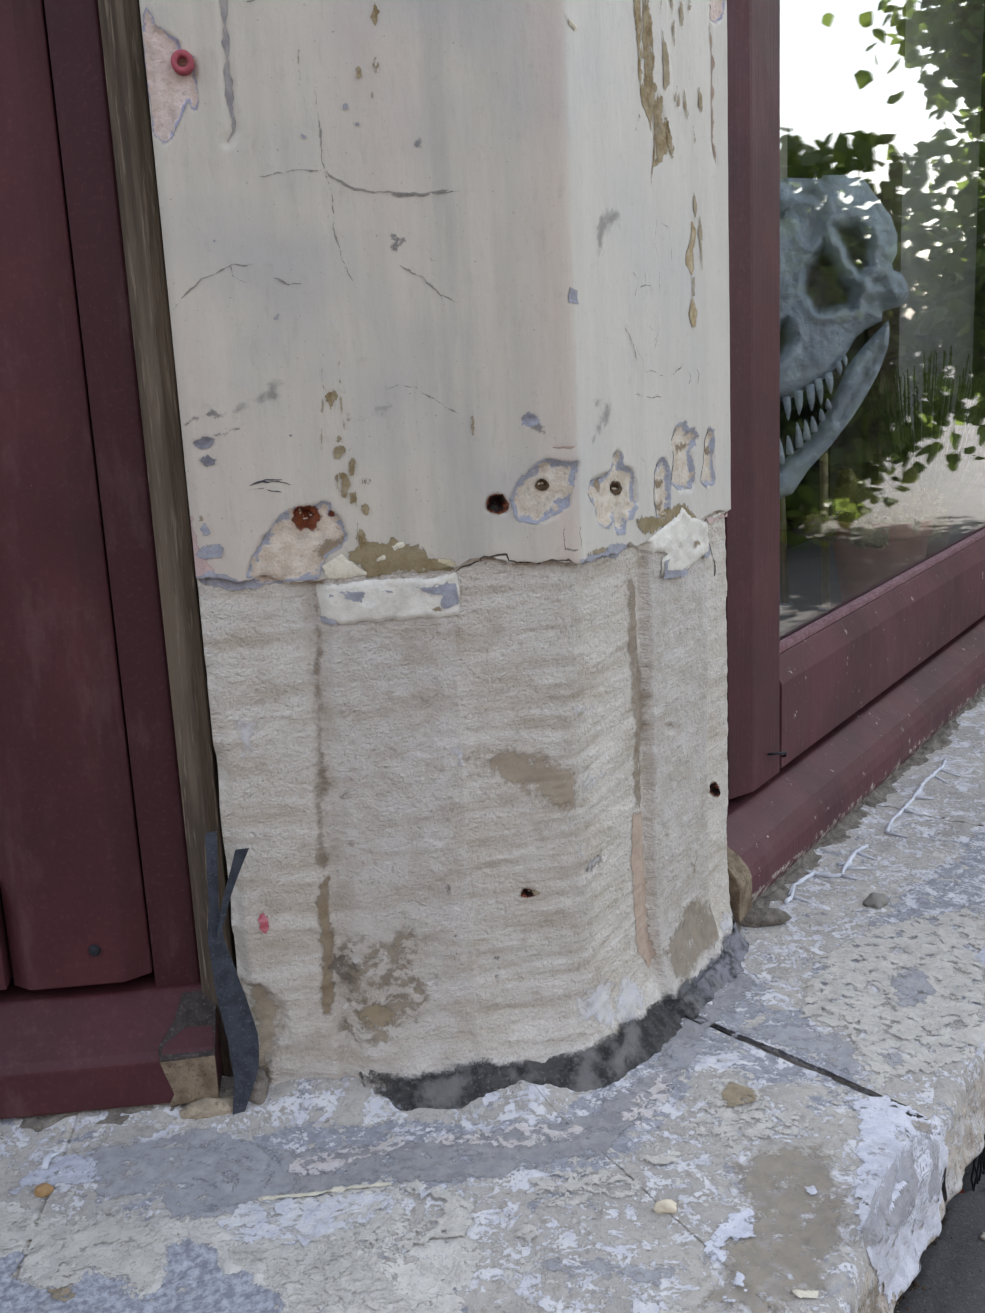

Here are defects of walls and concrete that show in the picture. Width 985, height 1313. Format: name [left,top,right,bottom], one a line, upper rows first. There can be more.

spalling [142,7,199,144]
peeling [634,0,703,181]
crack [260,103,453,279]
corrosion [291,505,322,531]
flaking render [190,379,733,1089]
spalling [863,892,889,909]
peeling [429,1122,586,1148]
peeling [799,906,985,1309]
peeling [0,1136,481,1313]
peeling [703,1208,757,1302]
peeling [792,1289,819,1298]